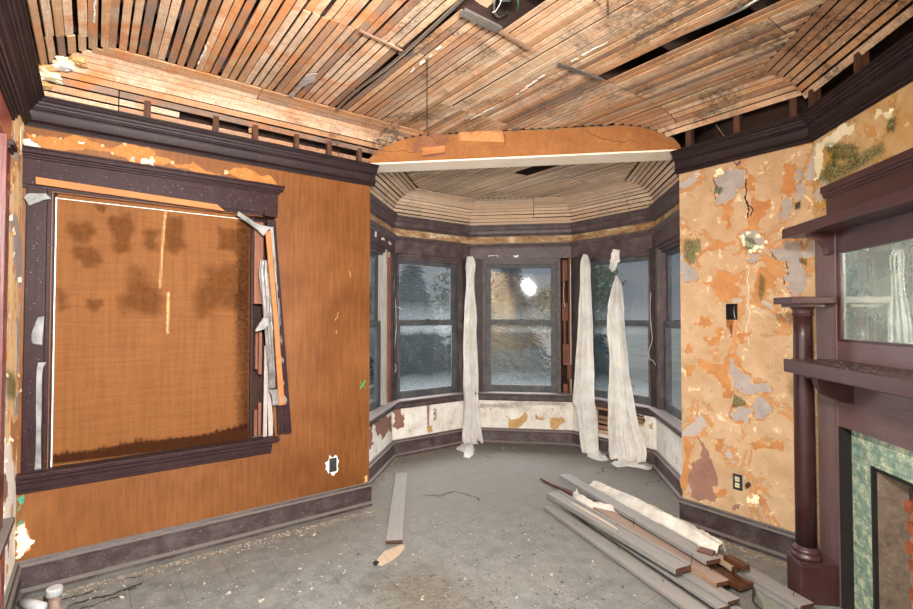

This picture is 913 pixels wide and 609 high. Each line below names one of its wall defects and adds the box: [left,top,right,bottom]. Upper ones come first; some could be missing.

peeling [875,108,894,120]
peeling [10,123,277,195]
leakage [821,145,881,181]
crack [744,180,754,218]
peeling [680,122,855,302]
peeling [684,332,774,424]
peeling [3,305,35,591]
peeling [369,409,405,450]
peeling [506,408,565,430]
peeling [680,437,767,511]
crack [62,575,144,609]
crack [752,588,761,609]